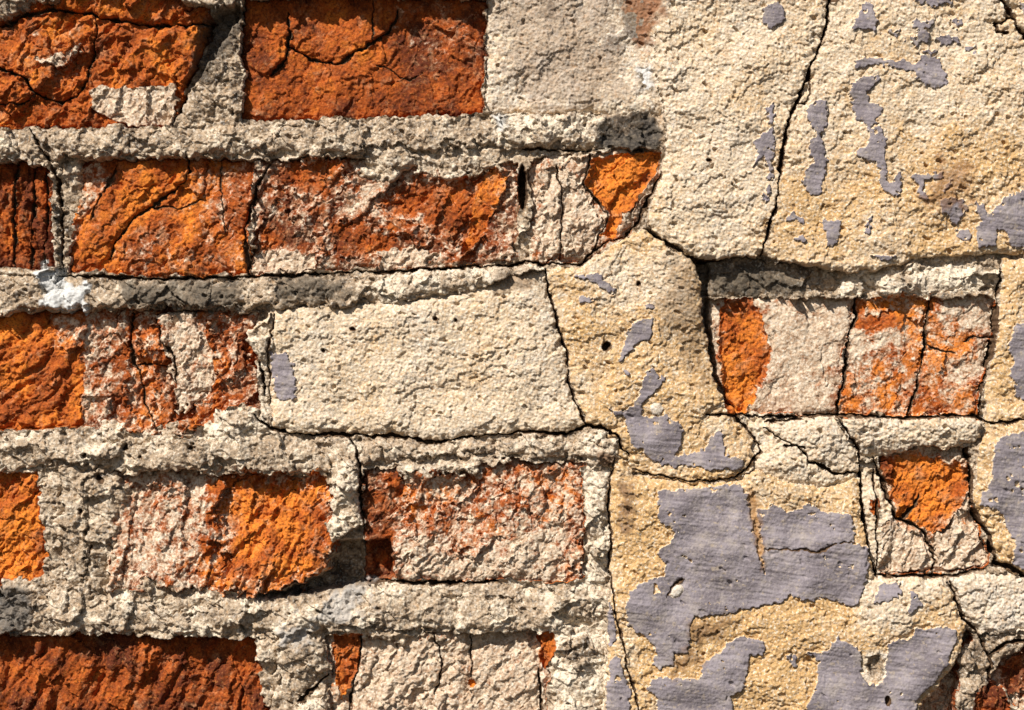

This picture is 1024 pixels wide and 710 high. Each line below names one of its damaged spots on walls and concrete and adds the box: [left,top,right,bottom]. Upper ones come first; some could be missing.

crack [0,7,209,106]
crack [172,93,188,126]
crack [271,1,422,82]
crack [759,3,830,257]
peeling [849,0,1024,251]
spalling [256,155,508,271]
spalling [207,467,341,599]
crack [11,129,723,710]
spalling [717,297,773,414]
peeling [605,484,923,710]
crack [632,268,1024,692]
spalling [869,449,987,570]